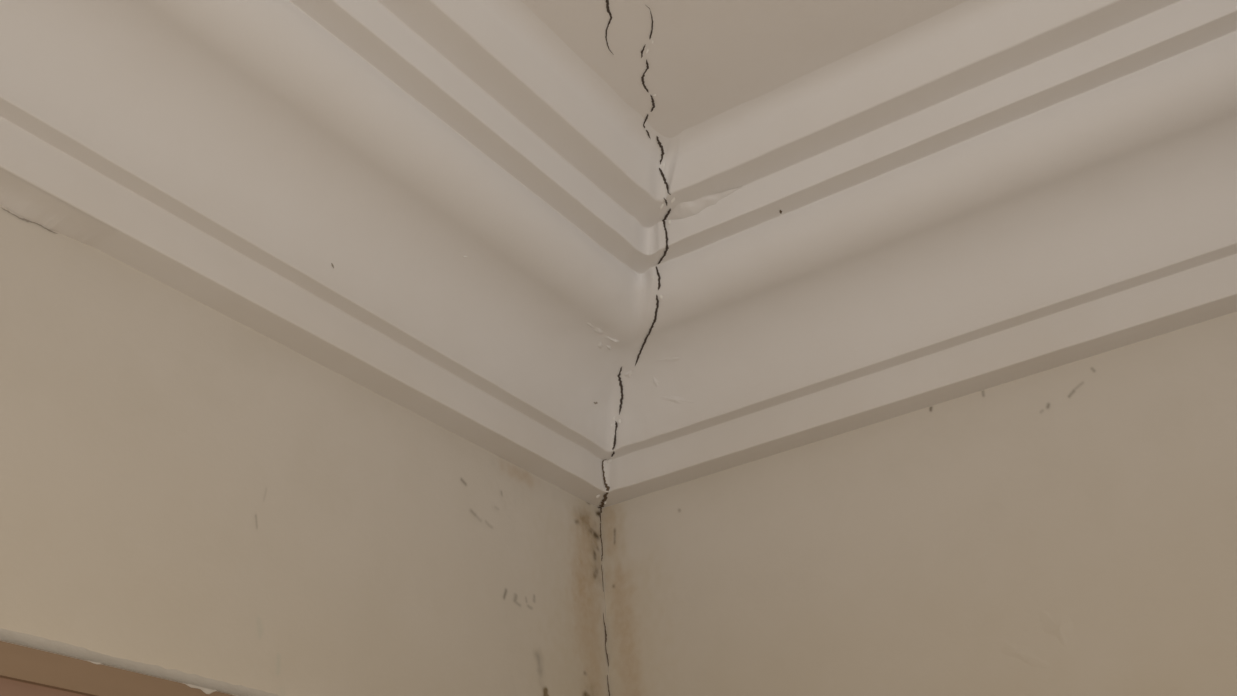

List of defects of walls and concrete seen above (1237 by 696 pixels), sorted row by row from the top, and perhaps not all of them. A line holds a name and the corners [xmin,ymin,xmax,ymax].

leakage [492,456,705,696]
crack [596,0,675,696]